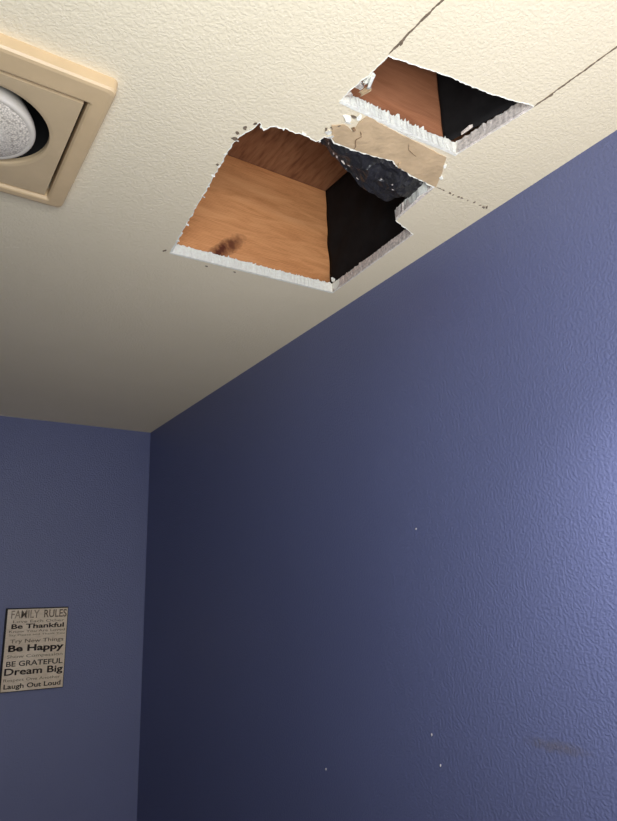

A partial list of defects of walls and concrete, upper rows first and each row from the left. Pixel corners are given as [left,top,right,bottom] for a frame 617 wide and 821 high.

crack [389,0,444,54]
crack [534,46,617,107]
peeling [319,114,447,187]